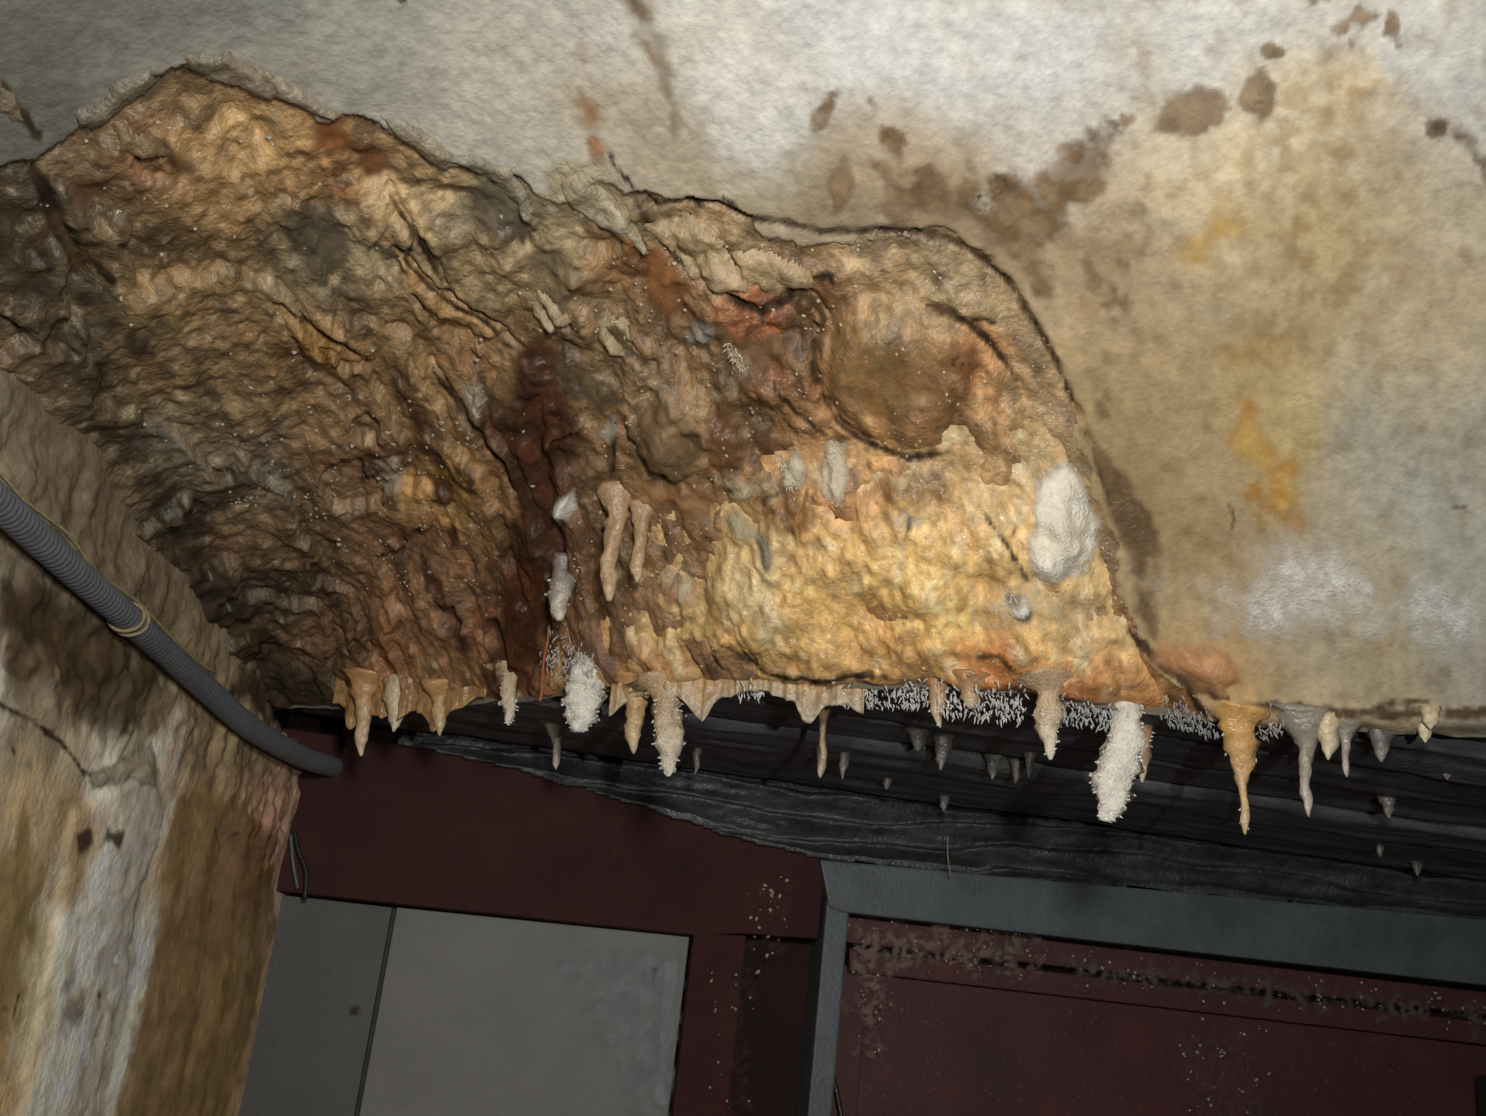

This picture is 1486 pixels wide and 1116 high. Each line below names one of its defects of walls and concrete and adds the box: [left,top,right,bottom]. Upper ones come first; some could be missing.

leakage [1159,44,1284,135]
leakage [1334,6,1399,43]
leakage [139,475,327,741]
rust [502,563,550,685]
spalling [0,50,1207,729]
crack [609,421,617,471]
rust [717,328,785,376]
leakage [481,338,1169,708]
crack [730,272,941,462]
crack [609,155,1073,399]
leakage [894,114,1133,263]
leakage [77,778,162,1116]